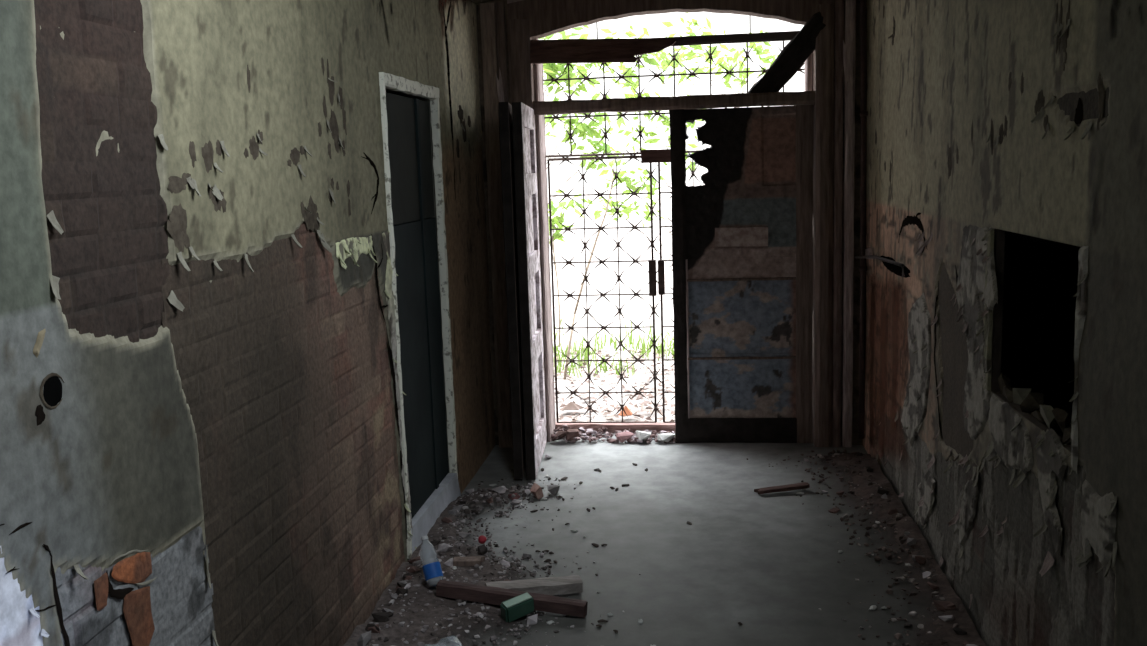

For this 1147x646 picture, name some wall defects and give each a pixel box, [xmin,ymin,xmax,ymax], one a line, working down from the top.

flaking render [1030,72,1109,140]
spalling [865,247,910,278]
flaking render [876,224,1117,646]
crack [0,522,70,646]